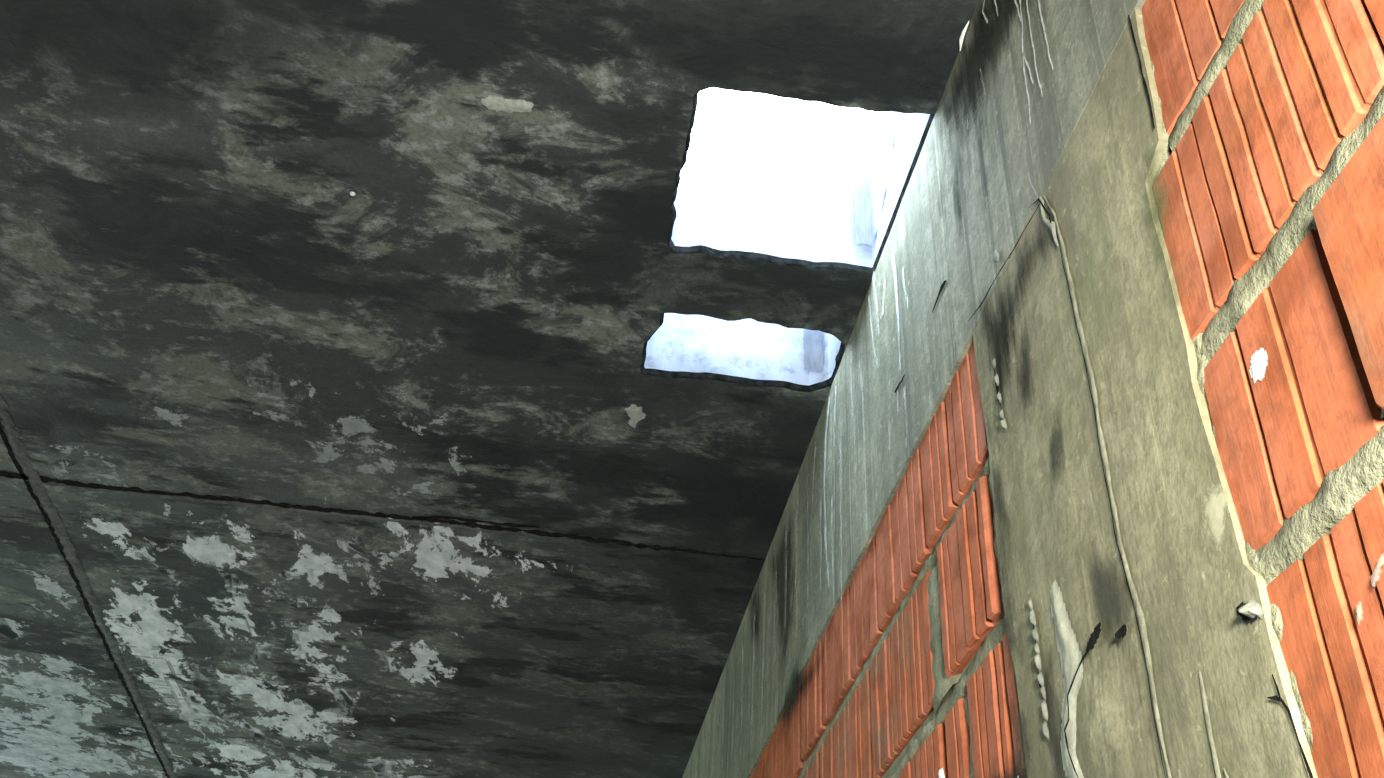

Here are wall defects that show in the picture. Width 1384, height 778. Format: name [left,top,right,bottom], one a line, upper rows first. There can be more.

leakage [944,0,1053,128]
leakage [1050,428,1062,475]
crack [968,196,1172,778]
peeling [0,503,572,778]
crack [0,395,762,778]
leakage [1094,564,1121,636]
leakage [995,716,1028,778]